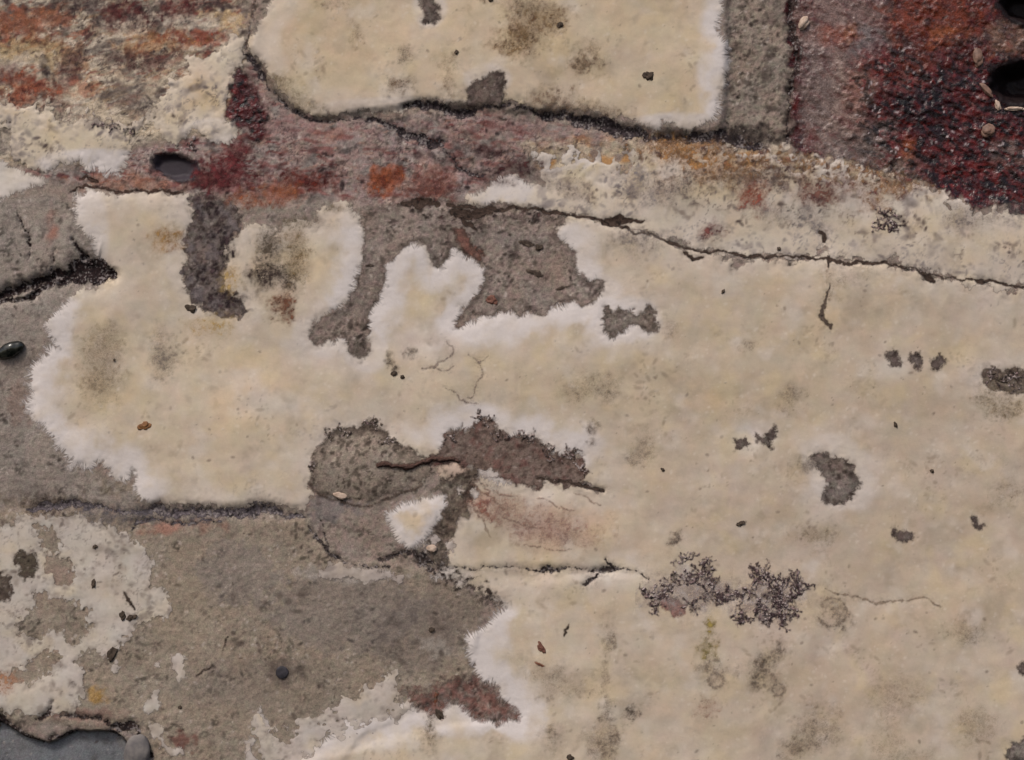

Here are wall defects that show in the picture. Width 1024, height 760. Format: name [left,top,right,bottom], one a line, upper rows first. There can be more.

rust [0,0,219,79]
crack [243,0,803,178]
rust [185,139,326,206]
rust [477,146,543,183]
rust [626,136,916,211]
crack [0,215,117,304]
crack [401,197,1024,329]
flaking render [0,184,1024,760]
crack [26,498,649,586]